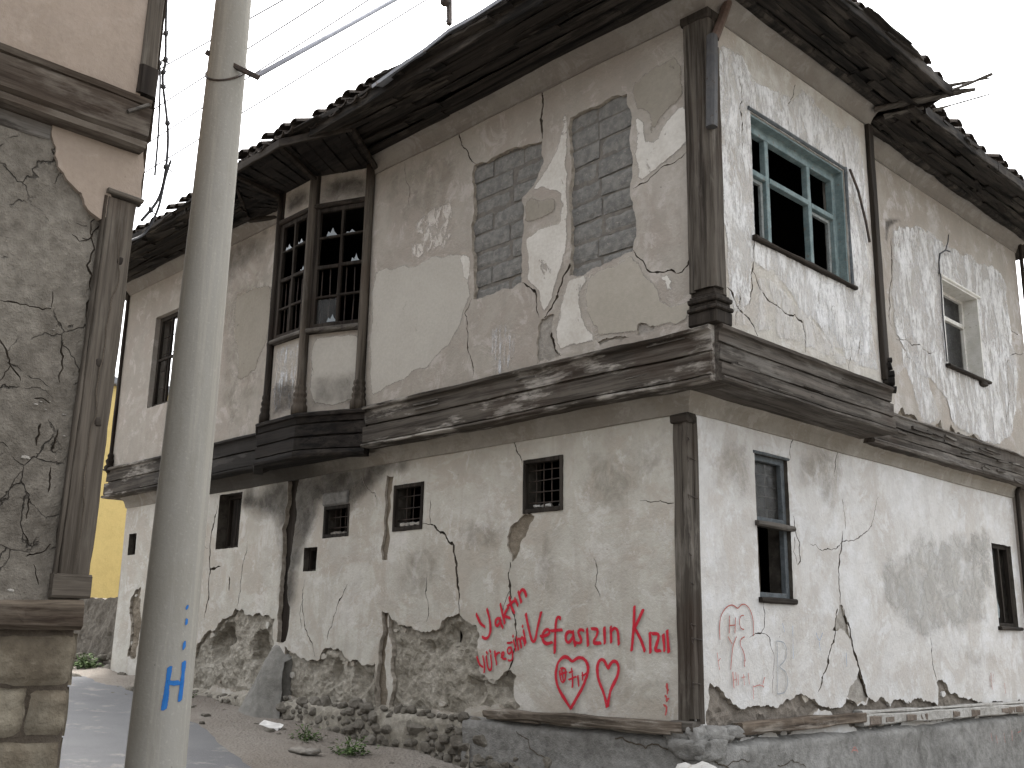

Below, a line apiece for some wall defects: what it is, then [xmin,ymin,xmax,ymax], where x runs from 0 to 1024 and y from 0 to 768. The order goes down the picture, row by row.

peeling [526,58,689,364]
crack [72,219,100,327]
crack [727,242,806,352]
peeling [893,226,1018,444]
crack [0,340,64,585]
flaking render [127,587,141,659]
flaking render [193,476,520,714]
crack [423,501,460,612]
crack [503,562,517,676]
flaking render [507,514,534,562]
crack [793,500,877,698]
flaking render [705,672,1021,741]